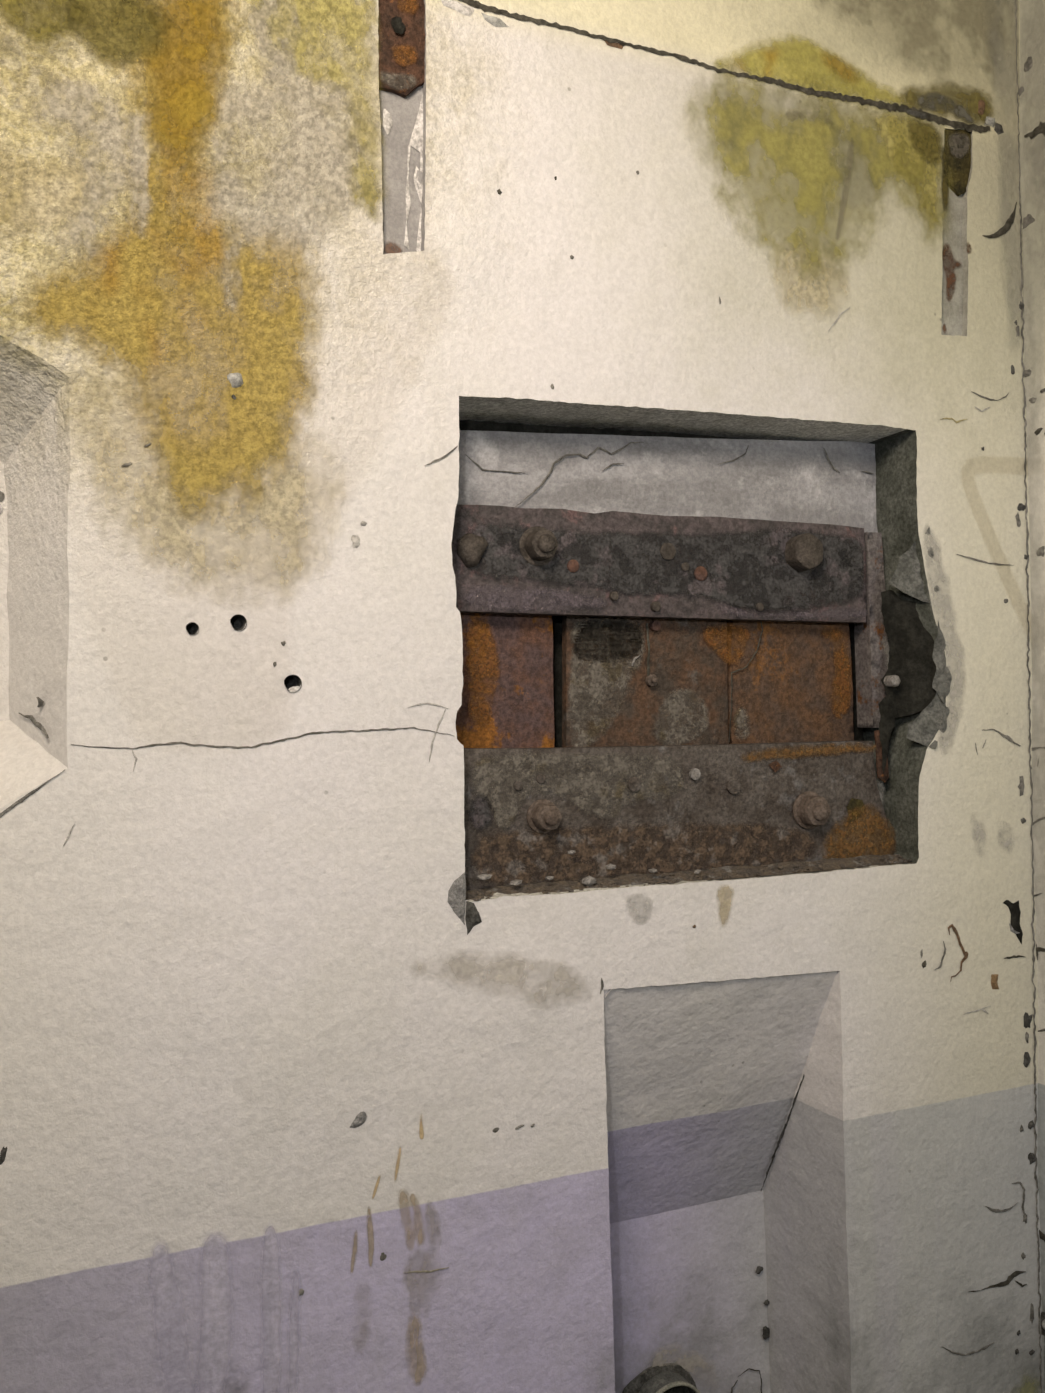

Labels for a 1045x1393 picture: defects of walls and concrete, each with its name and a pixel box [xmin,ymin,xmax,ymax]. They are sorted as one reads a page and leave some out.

damp [706,38,992,307]
damp [0,0,380,570]
rust [942,243,971,300]
crack [0,697,453,817]
crack [425,0,1045,1393]
rust [748,730,889,783]
rust [823,630,851,718]
spalling [879,527,952,773]
rust [472,823,816,884]
damp [200,1237,230,1393]
rust [351,1149,415,1272]
crack [403,1266,449,1274]